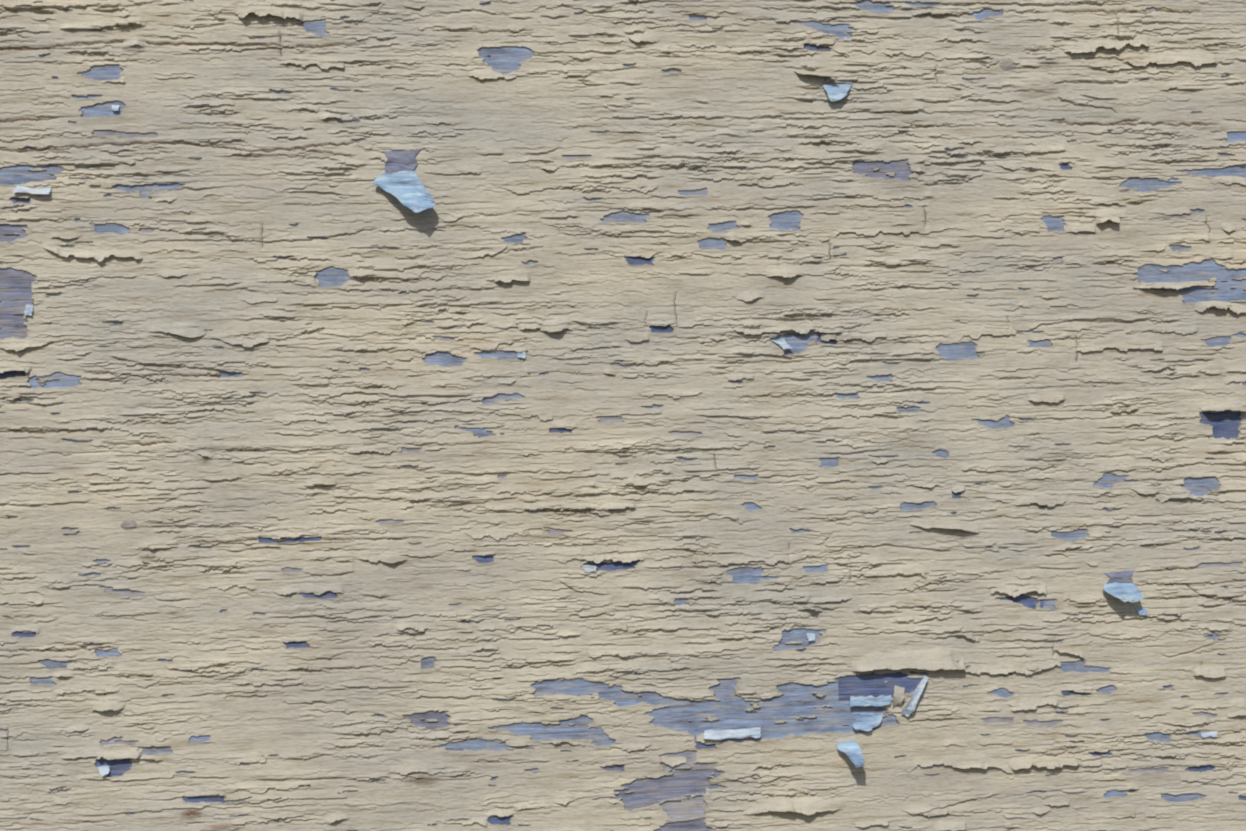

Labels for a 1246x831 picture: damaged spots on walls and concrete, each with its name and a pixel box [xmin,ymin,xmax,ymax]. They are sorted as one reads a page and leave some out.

peeling [468,47,534,80]
peeling [794,71,853,102]
peeling [0,164,62,243]
peeling [357,142,463,222]
peeling [43,223,154,262]
peeling [1077,222,1246,352]
peeling [0,262,81,406]
peeling [708,318,888,356]
peeling [1199,405,1246,440]
peeling [1103,569,1147,615]
peeling [402,710,463,730]
peeling [430,644,1116,831]